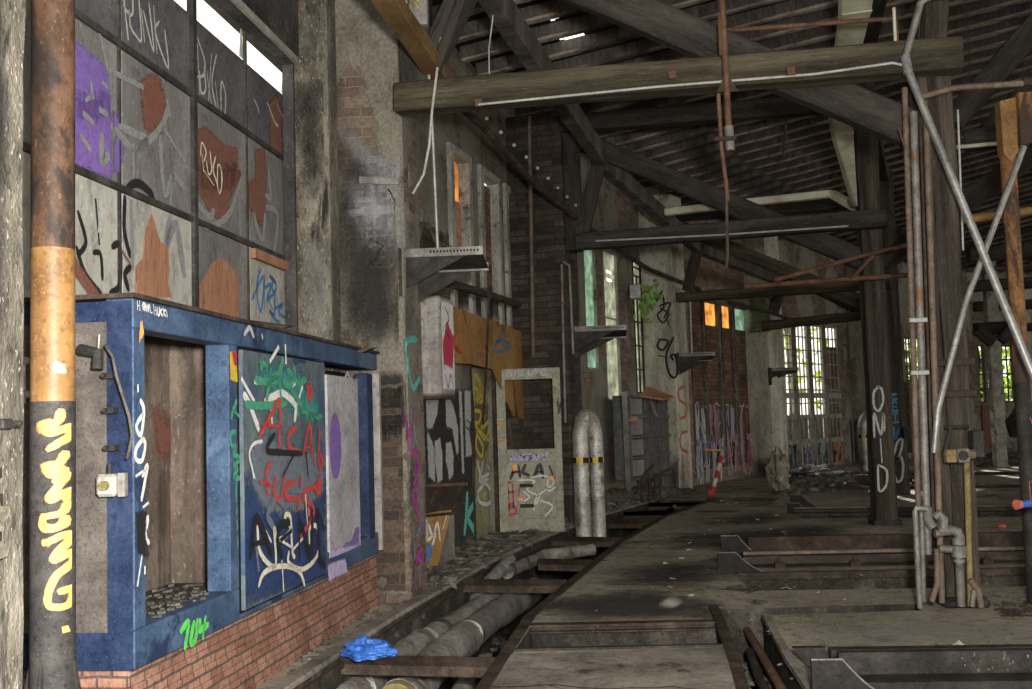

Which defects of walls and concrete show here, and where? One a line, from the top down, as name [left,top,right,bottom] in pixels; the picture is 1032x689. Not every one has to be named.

crack [459,681,693,689]